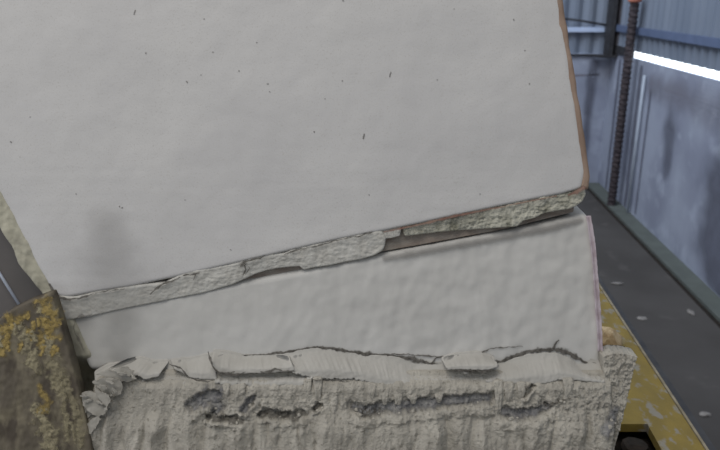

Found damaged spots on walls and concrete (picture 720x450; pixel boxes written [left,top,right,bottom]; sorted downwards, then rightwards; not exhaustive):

crack [284,232,372,255]
crack [240,255,265,275]
crack [49,283,124,301]
crack [150,273,199,295]
crack [170,340,587,382]
peeling [80,366,137,434]
spalling [185,387,254,425]
spalling [258,403,324,422]
spalling [351,394,491,420]
spalling [501,398,571,422]